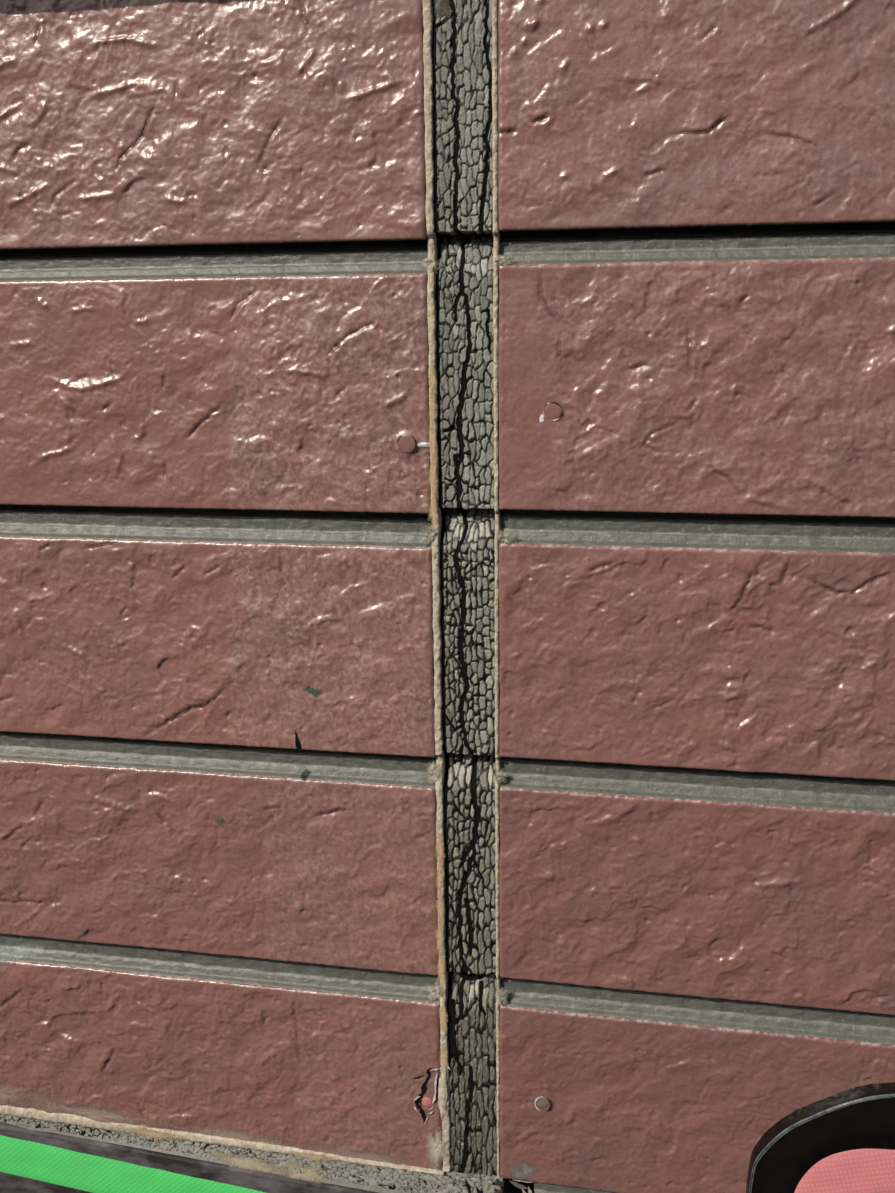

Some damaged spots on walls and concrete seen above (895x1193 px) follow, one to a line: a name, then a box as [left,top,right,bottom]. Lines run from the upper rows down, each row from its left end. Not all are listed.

peeling [412,1066,450,1166]